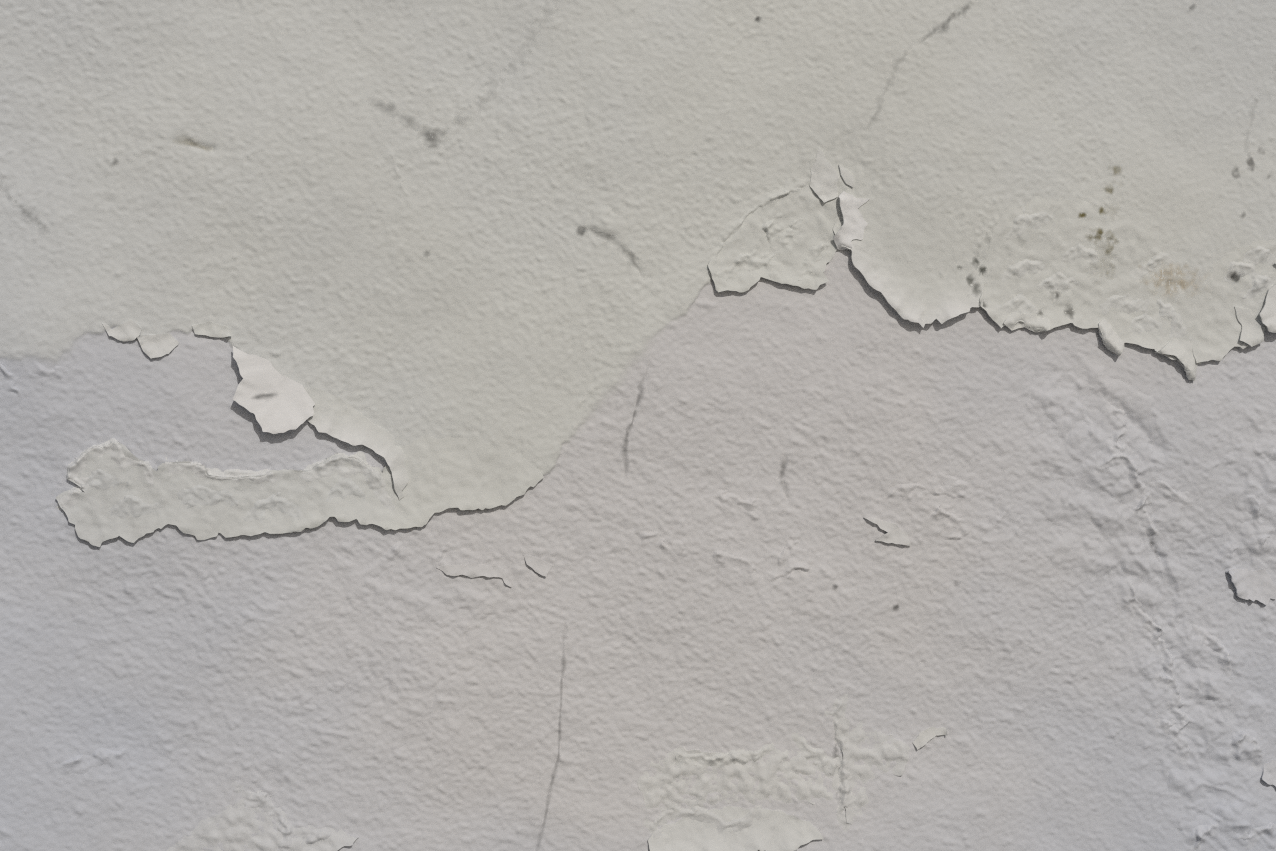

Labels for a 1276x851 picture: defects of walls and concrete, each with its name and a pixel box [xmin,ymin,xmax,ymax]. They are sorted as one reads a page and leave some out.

peeling [701,147,1276,381]
peeling [55,320,544,547]
peeling [637,733,841,851]